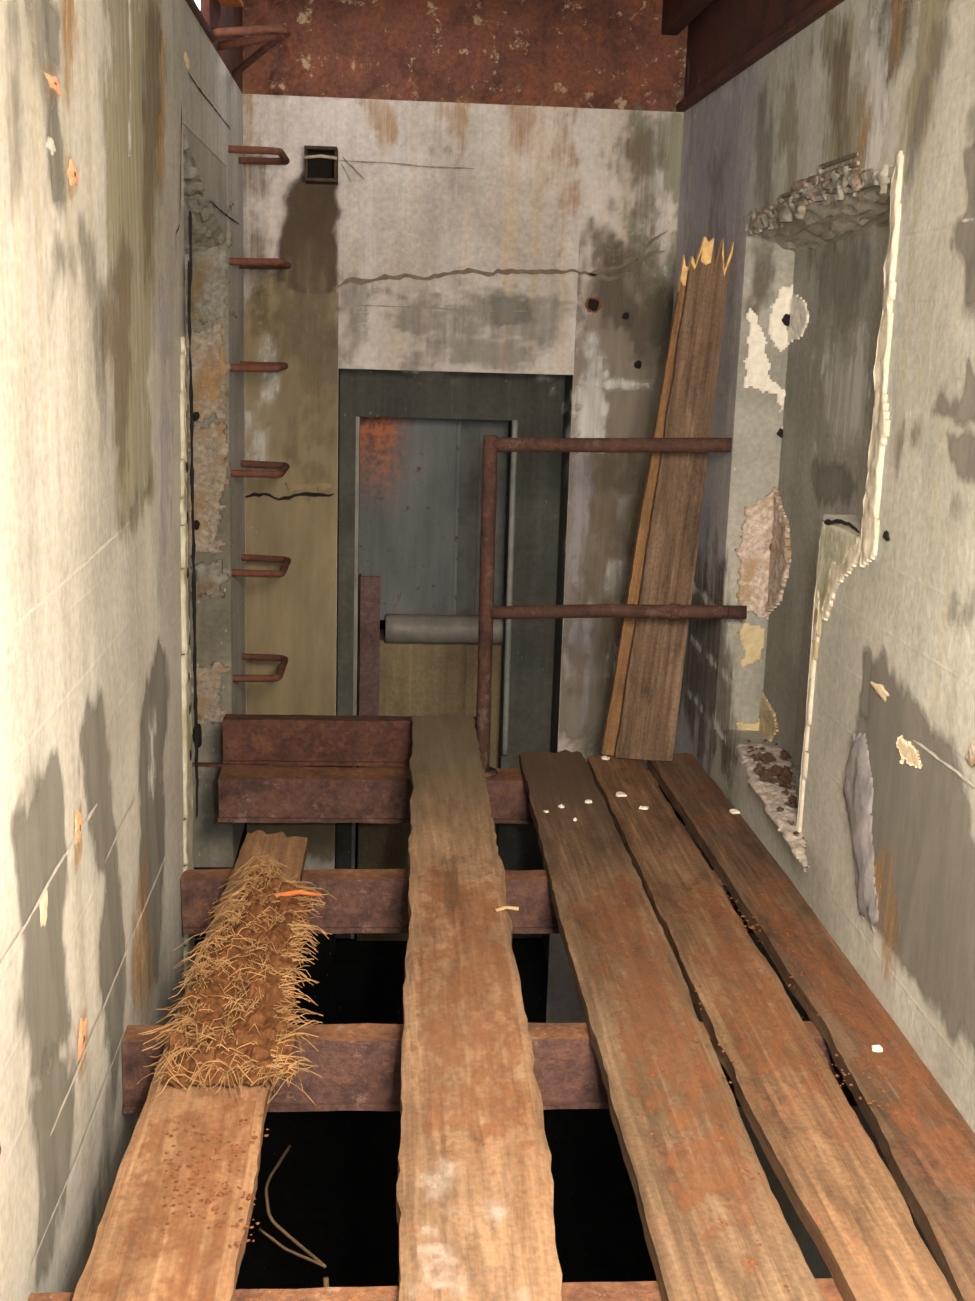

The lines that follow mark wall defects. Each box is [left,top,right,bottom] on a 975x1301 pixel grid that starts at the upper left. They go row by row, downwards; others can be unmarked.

damp [12,752,75,1285]
damp [50,94,64,201]
damp [80,693,126,1170]
damp [139,639,168,988]
crack [245,480,334,501]
damp [244,173,340,715]
crack [337,231,668,312]
peeling [735,692,779,742]
peeling [735,487,792,668]
peeling [743,151,904,832]
damp [855,649,975,1049]
damp [956,145,975,309]